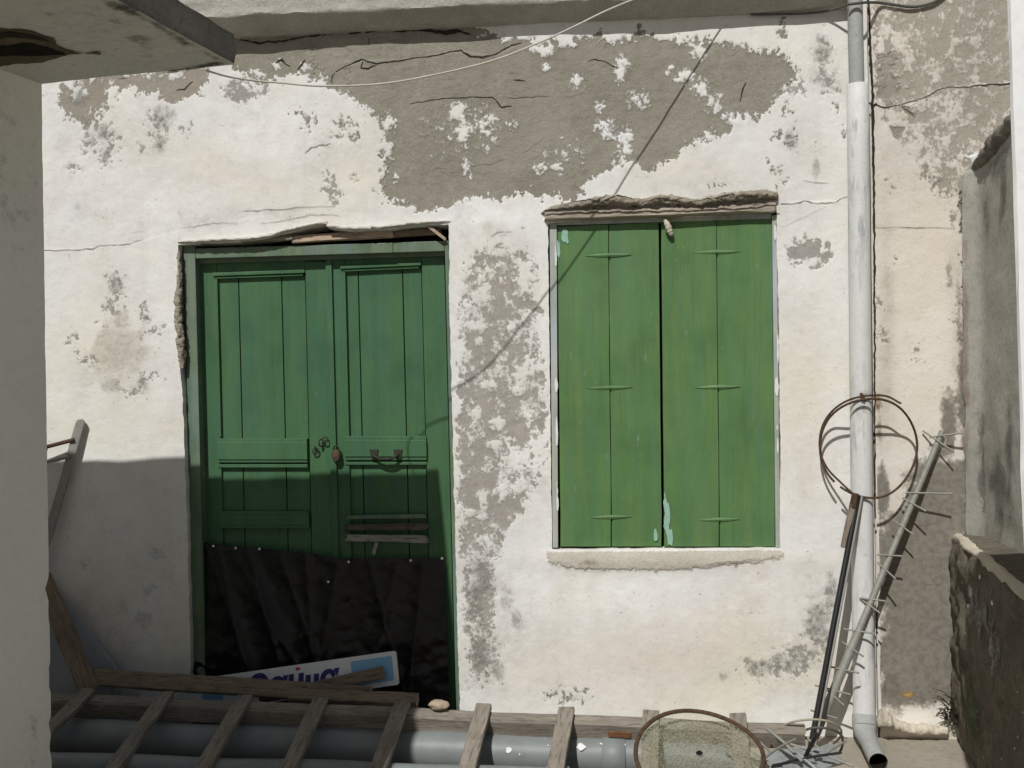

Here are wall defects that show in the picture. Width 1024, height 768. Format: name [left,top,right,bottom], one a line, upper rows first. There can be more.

crack [240,29,522,81]
crack [411,79,536,108]
peeling [870,0,1011,234]
crack [52,231,142,251]
crack [184,206,334,228]
peeling [58,16,847,370]
crack [867,0,1010,512]
peeling [91,371,167,400]
peeling [455,243,558,688]